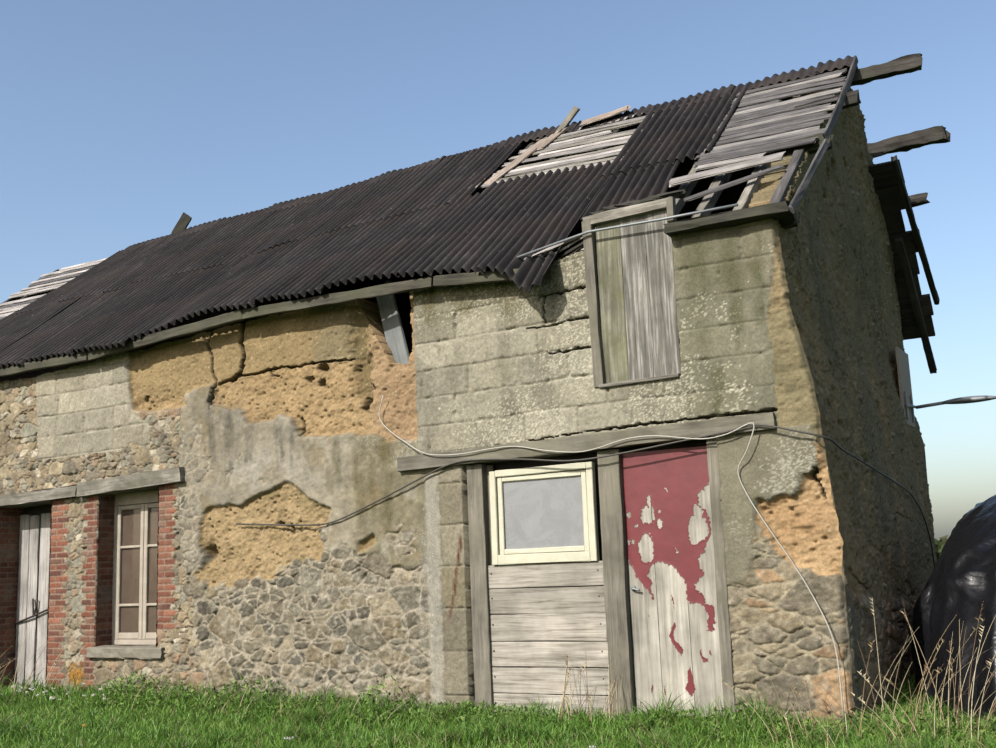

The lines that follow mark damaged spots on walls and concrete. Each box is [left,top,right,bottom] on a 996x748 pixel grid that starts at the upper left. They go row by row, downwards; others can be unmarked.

crack [210,324,356,402]
flaking render [193,481,332,587]
flaking render [358,533,377,553]
peeling [621,446,715,631]
spalling [756,442,843,576]
crack [812,466,826,496]
peeling [669,623,683,654]
peeling [685,669,695,696]